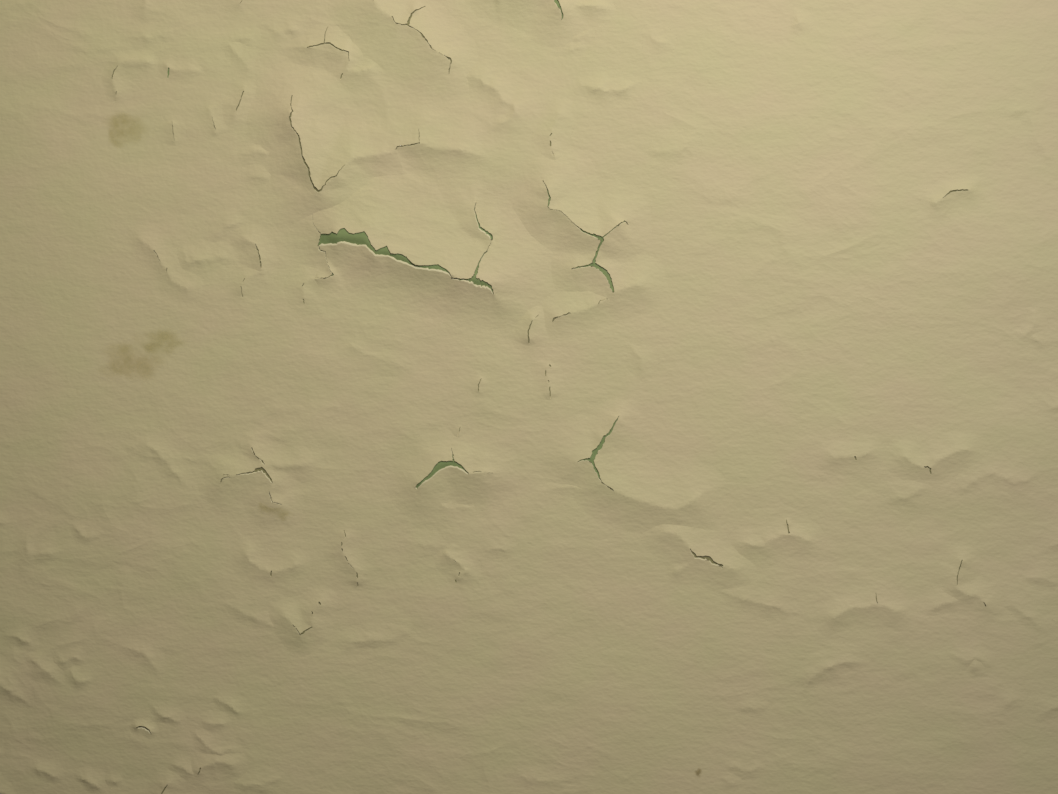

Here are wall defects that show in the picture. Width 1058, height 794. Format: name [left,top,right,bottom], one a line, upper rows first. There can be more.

crack [287,20,385,90]
crack [465,0,617,49]
peeling [279,173,556,332]
crack [510,145,669,323]
crack [387,427,520,519]
crack [640,524,758,593]